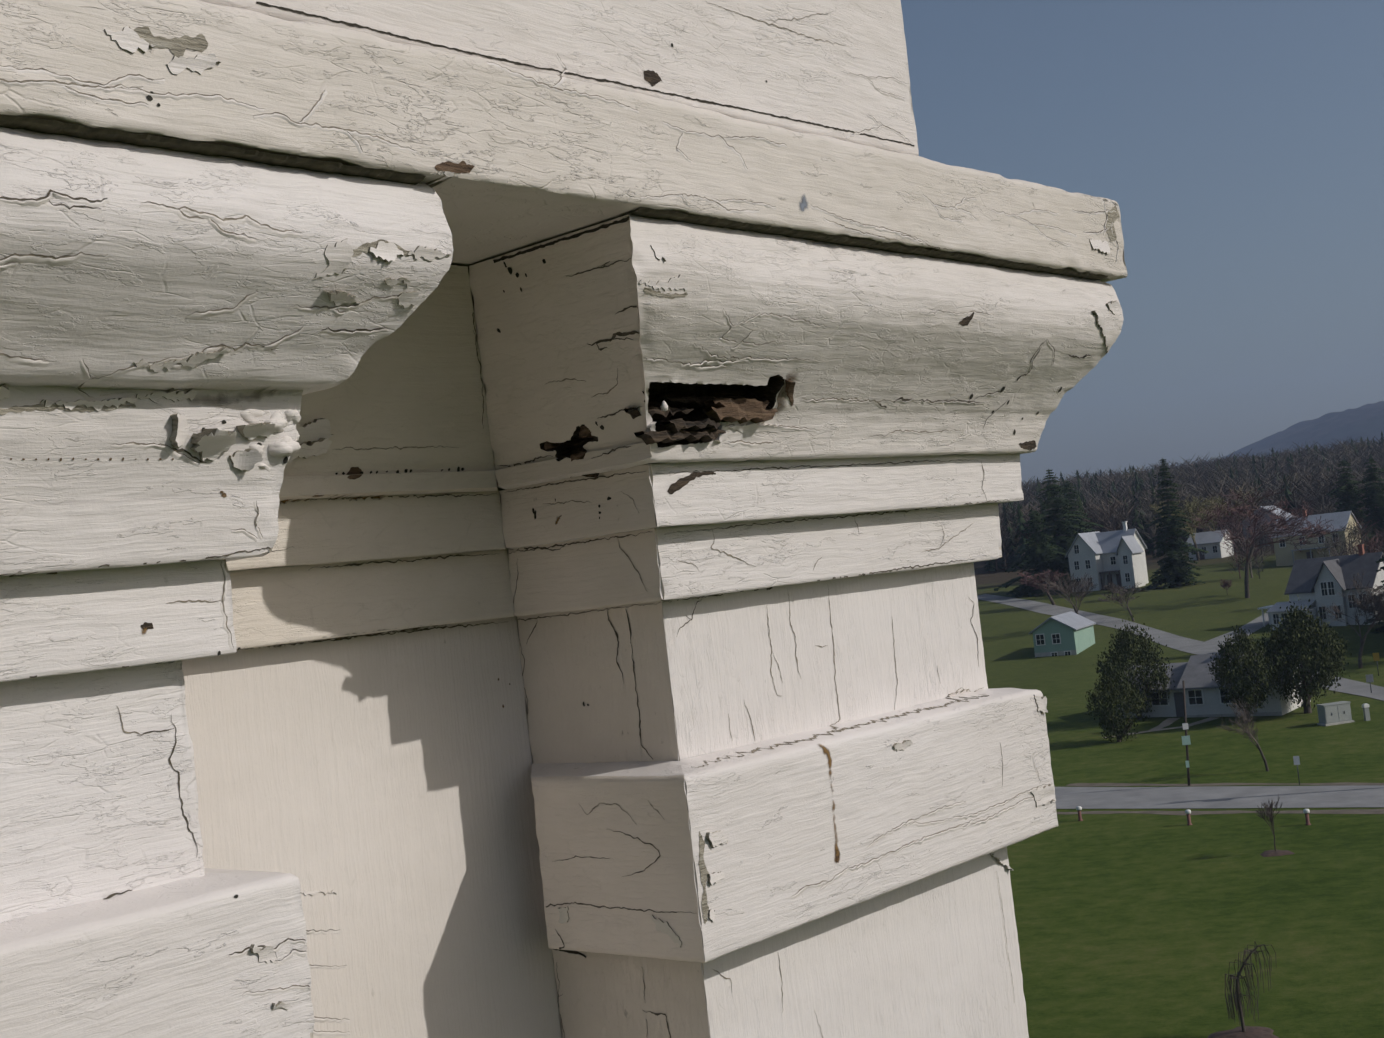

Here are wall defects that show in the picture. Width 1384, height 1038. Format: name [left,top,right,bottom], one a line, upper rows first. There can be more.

peeling [104,26,221,75]
crack [0,189,302,244]
peeling [314,238,451,309]
peeling [0,384,333,472]
crack [0,292,399,400]
crack [546,305,826,459]
peeling [715,423,795,442]
peeling [785,379,795,406]
crack [723,340,1093,448]
spalling [667,471,716,494]
crack [607,461,994,759]
crack [117,706,198,858]